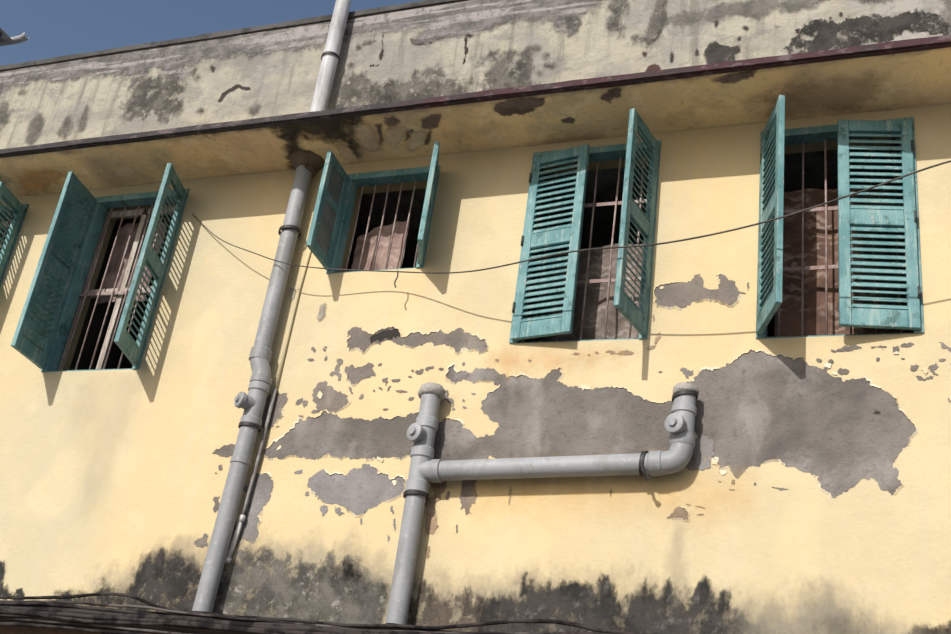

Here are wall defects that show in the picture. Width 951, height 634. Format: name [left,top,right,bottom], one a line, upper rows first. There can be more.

damp [606,0,951,64]
damp [123,71,185,122]
crack [211,66,250,102]
damp [263,63,472,169]
flaking render [494,98,545,116]
flaking render [652,273,749,322]
flaking render [228,325,673,558]
flaking render [680,342,951,498]
damp [0,561,24,601]
damp [212,549,391,624]
damp [407,573,767,634]
damp [909,622,951,634]